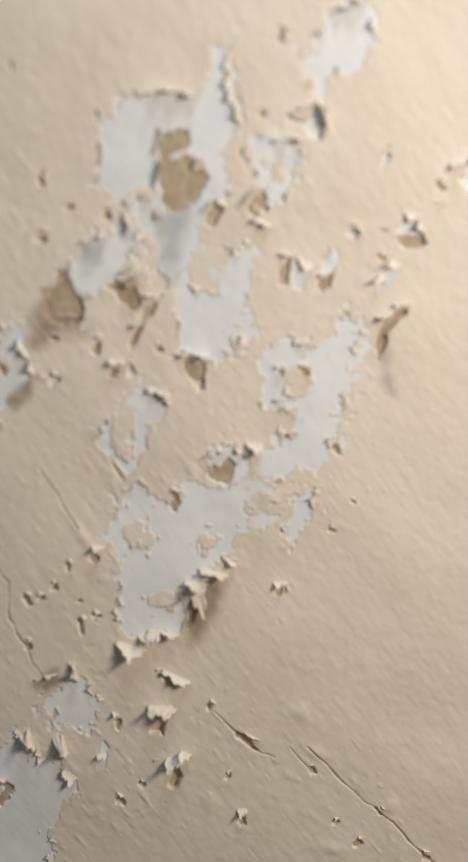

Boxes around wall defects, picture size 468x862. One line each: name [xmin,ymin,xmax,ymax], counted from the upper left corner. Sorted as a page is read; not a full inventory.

peeling [397,211,427,249]
peeling [0,312,60,422]
peeling [42,0,411,667]
peeling [0,659,121,862]
crack [254,746,433,862]